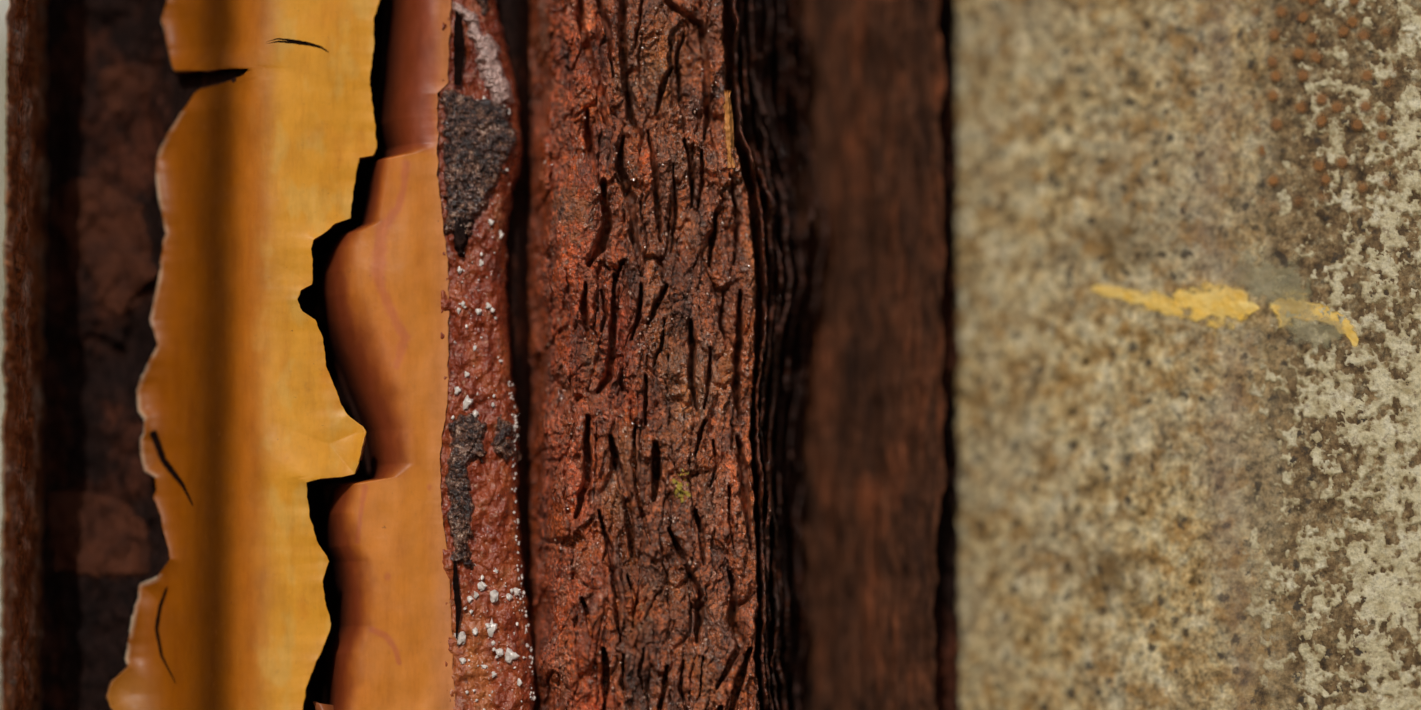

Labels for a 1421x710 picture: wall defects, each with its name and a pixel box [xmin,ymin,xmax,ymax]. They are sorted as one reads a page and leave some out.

peeling [106,0,828,710]